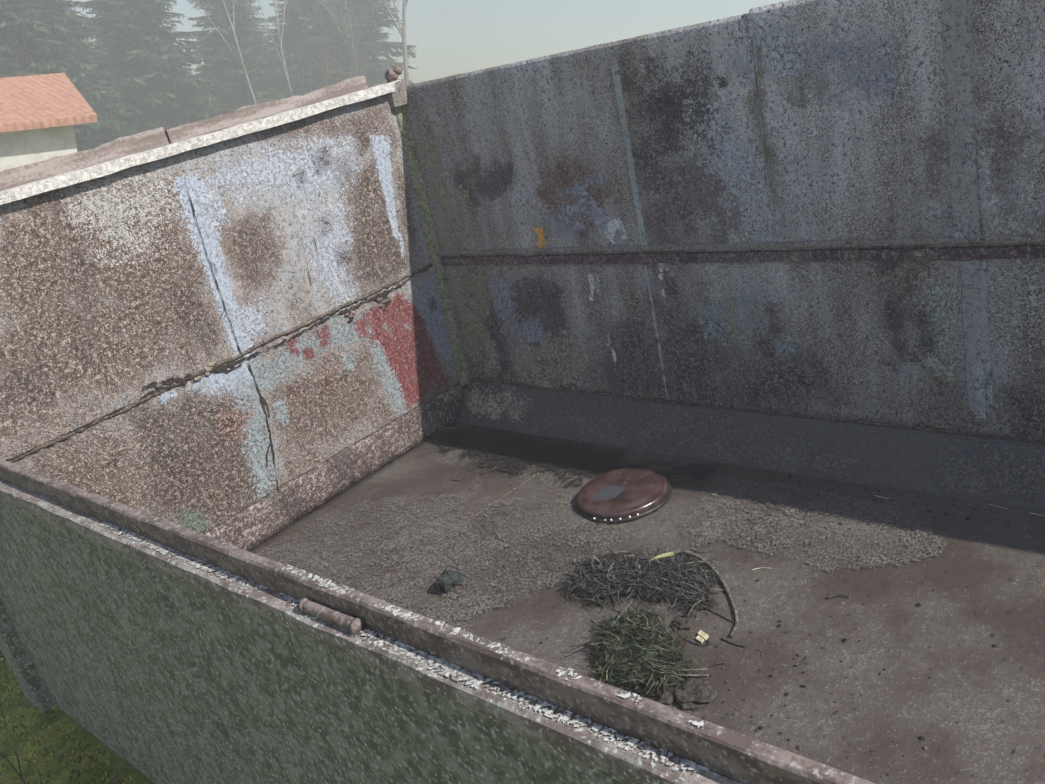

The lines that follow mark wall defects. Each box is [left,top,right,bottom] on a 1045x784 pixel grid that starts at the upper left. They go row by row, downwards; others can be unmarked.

crack [5,179,431,514]